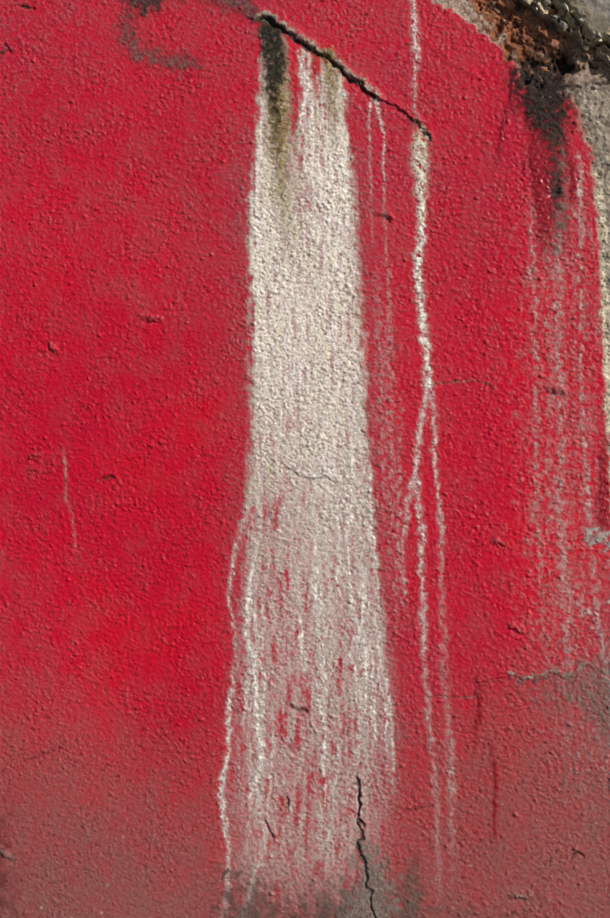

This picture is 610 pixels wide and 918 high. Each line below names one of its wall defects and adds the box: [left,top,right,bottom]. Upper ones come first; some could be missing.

crack [256,10,388,104]
corrosion [467,0,560,66]
crack [407,115,431,140]
water stain [511,47,585,308]
spalling [432,0,610,491]
water stain [219,16,394,875]
peeling [509,663,610,730]
crack [356,777,371,900]